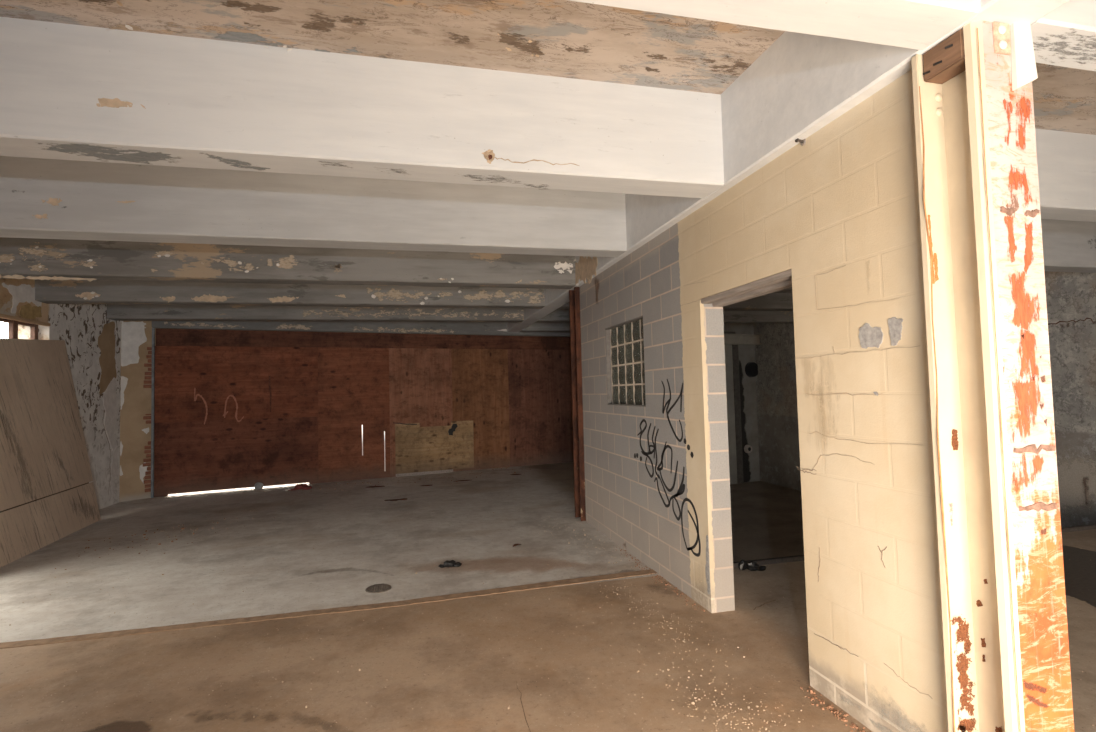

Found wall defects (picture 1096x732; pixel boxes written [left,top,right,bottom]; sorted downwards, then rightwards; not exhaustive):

peeling [96,98,146,109]
crack [494,157,579,166]
peeling [201,255,298,273]
peeling [191,294,227,302]
damp [1062,545,1096,607]
corrosion [951,614,986,732]